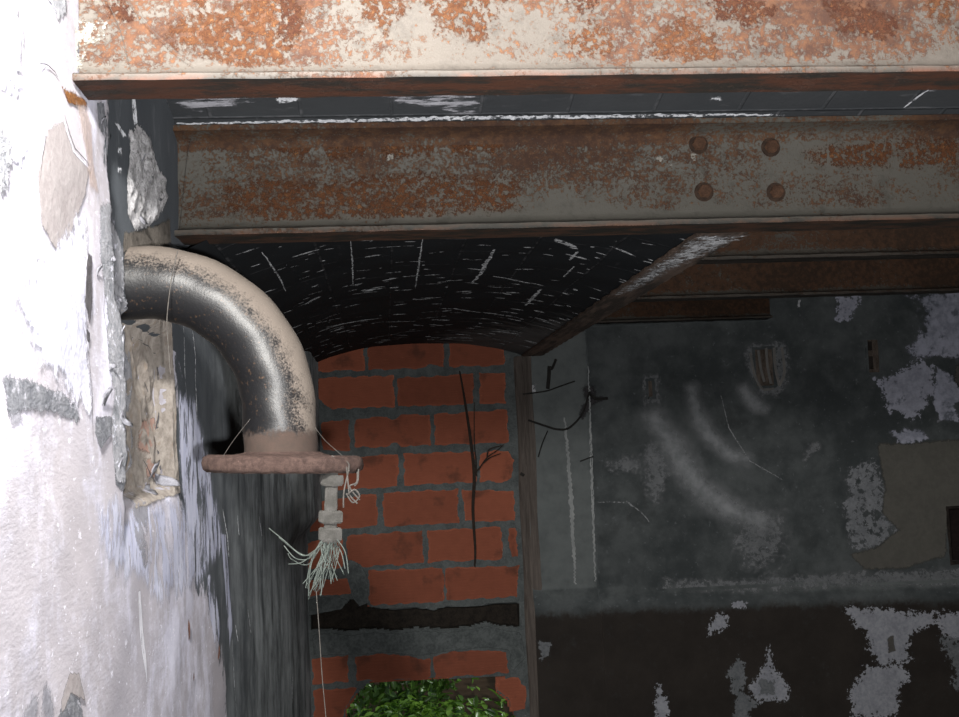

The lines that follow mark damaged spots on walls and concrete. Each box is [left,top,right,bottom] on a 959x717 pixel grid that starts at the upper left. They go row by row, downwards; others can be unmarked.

rust [165,0,308,68]
rust [361,0,411,36]
rust [424,0,508,44]
rust [564,0,616,59]
rust [702,0,778,28]
rust [221,144,523,221]
spalling [85,99,181,568]
peeling [2,374,80,424]
flaking render [852,439,959,570]
peeling [24,673,85,717]
peeling [725,646,791,717]
peeling [844,605,959,717]